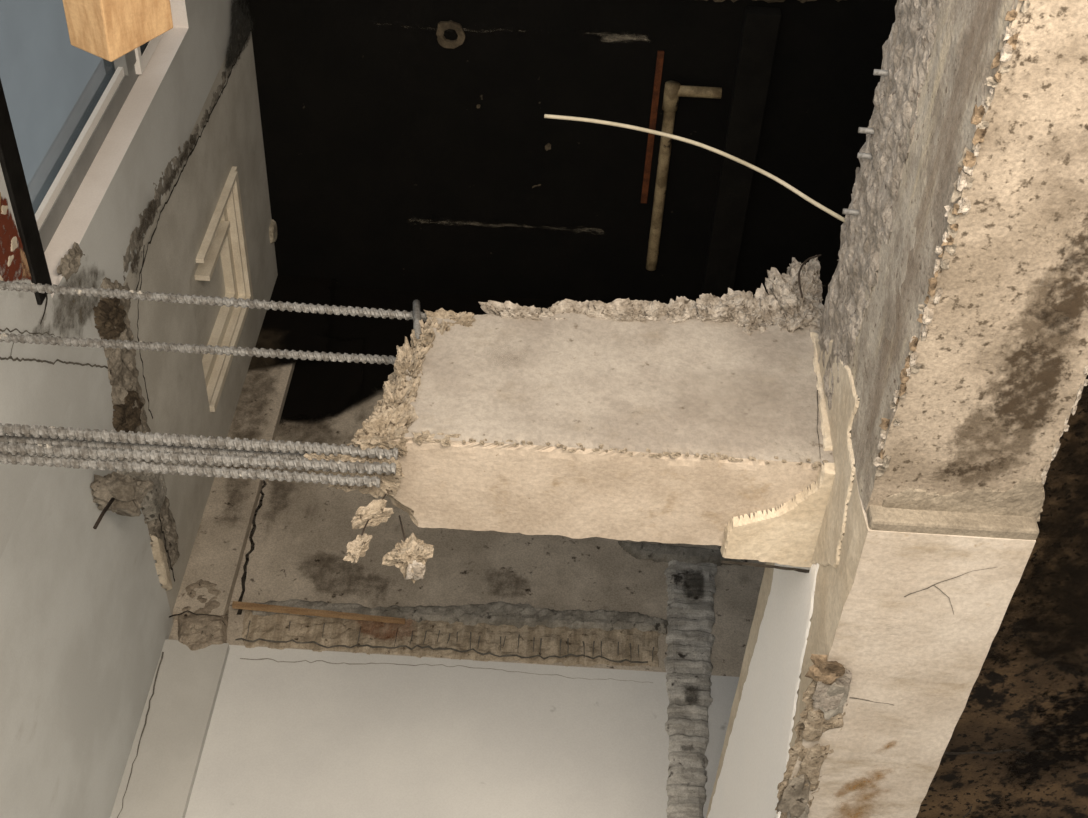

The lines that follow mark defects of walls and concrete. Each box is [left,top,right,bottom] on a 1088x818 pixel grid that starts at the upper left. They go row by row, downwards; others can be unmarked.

spalling [57,242,85,282]
spalling [93,37,250,444]
spalling [478,0,943,573]
spalling [873,0,1030,477]
damp [995,276,1088,429]
crack [237,480,266,615]
spalling [136,460,668,667]
spalling [412,430,533,447]
damp [944,461,1003,476]
spalling [775,654,852,818]